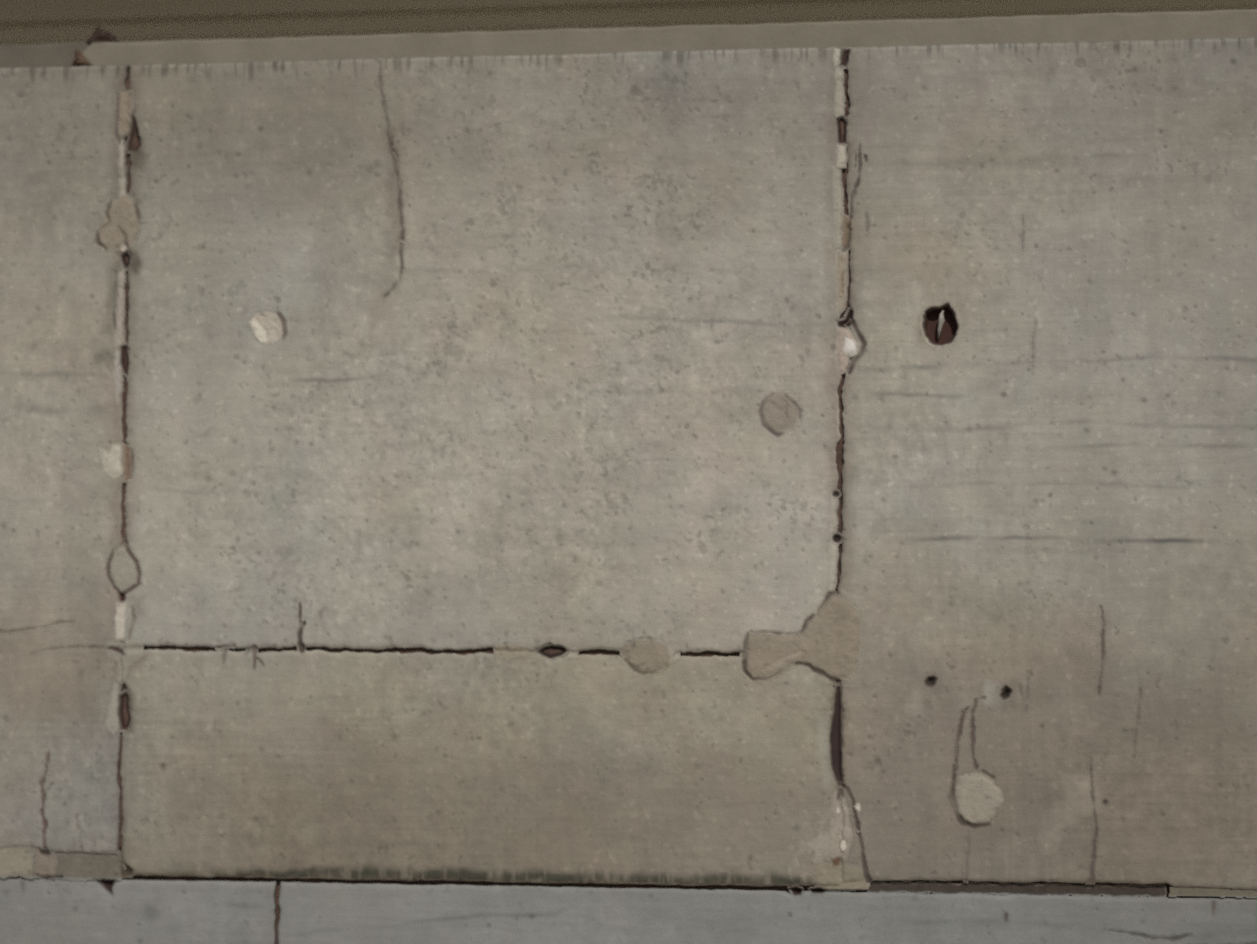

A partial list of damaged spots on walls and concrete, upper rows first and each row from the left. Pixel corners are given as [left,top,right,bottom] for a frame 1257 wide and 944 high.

crack [113,92,121,146]
crack [94,199,143,332]
crack [376,59,406,300]
crack [839,143,871,296]
crack [127,446,135,482]
crack [215,643,265,671]
crack [620,637,659,677]
crack [835,783,873,886]
crack [946,696,996,888]